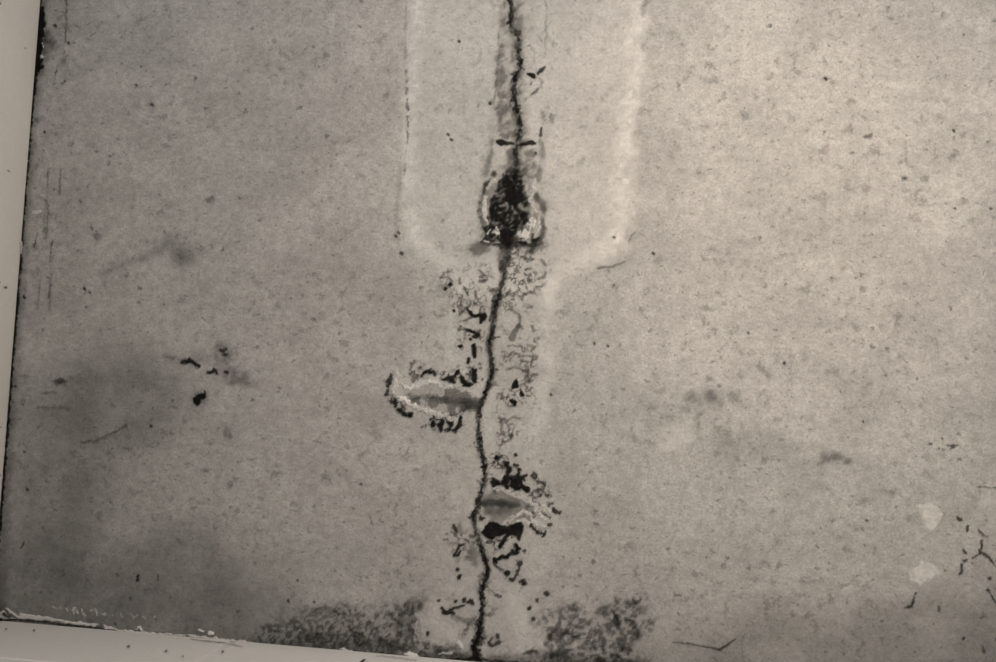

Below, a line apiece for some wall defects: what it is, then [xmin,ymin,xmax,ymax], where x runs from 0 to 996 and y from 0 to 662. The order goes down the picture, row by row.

crack [506,0,545,192]
damp [478,69,545,248]
damp [193,391,206,406]
damp [180,357,229,375]
spalling [384,363,483,433]
crack [439,237,535,662]
spalling [479,453,562,586]
damp [259,605,464,660]
damp [525,600,641,662]